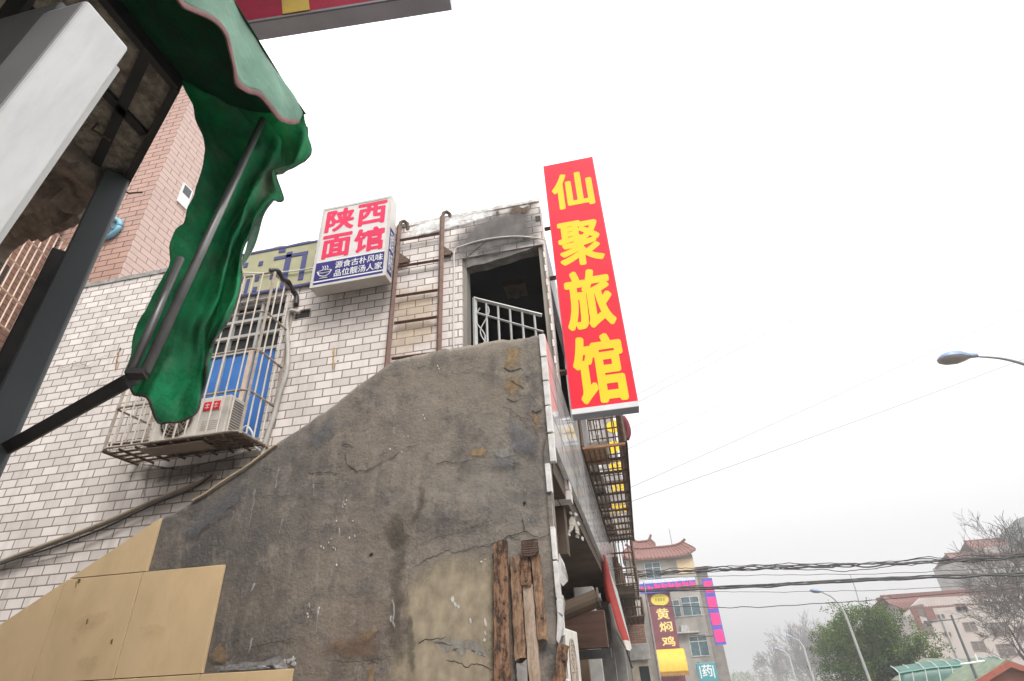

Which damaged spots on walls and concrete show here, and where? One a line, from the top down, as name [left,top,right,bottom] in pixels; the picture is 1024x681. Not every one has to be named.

damp [411,211,537,257]
crack [263,444,418,497]
crack [428,517,551,547]